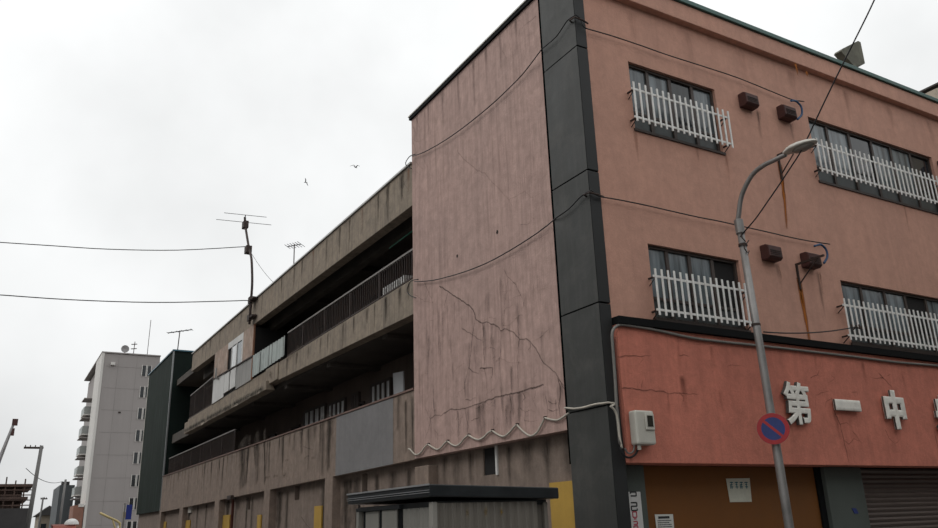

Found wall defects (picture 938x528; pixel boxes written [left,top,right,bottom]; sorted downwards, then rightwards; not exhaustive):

corrosion [778,165,787,227]
corrosion [797,279,810,340]
crack [442,287,561,415]